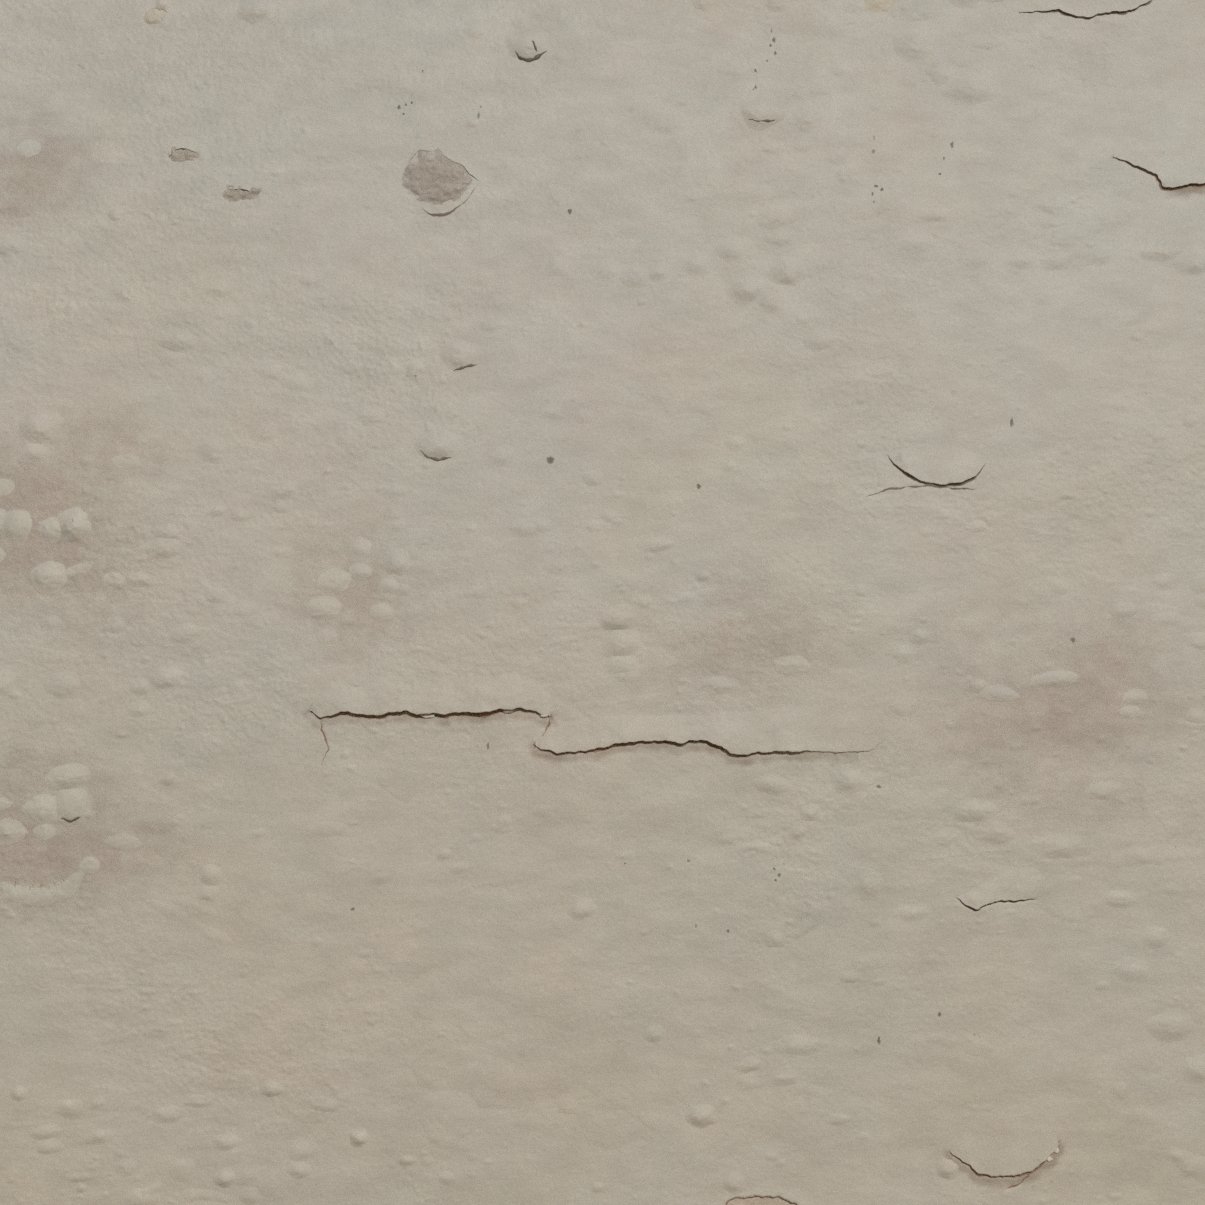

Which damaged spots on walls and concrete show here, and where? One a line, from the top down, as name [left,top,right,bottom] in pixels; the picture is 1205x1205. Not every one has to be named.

crack [1113,145,1205,191]